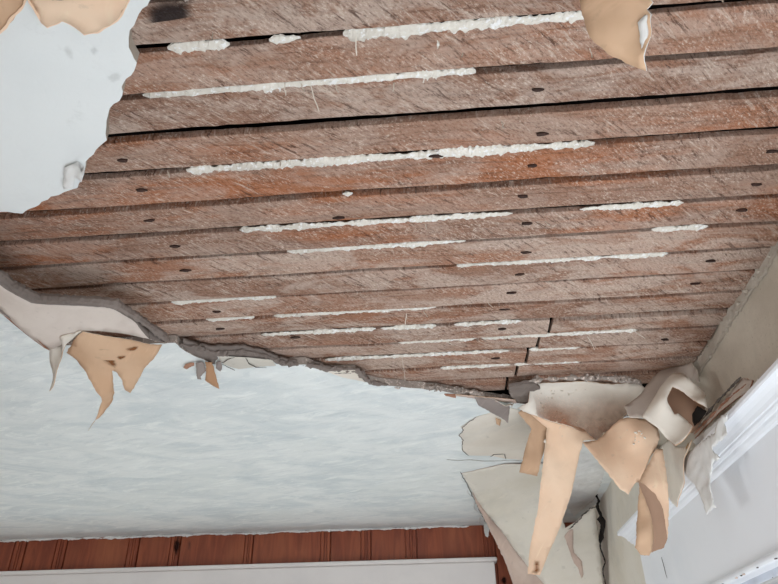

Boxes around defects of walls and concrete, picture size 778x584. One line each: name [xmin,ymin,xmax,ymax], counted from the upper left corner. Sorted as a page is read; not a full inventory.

flaking render [638,15,648,49]
peeling [63,162,84,190]
spalling [0,270,170,341]
flaking render [694,241,778,377]
flaking render [180,337,401,389]
flaking render [412,373,642,403]
crack [569,494,606,584]